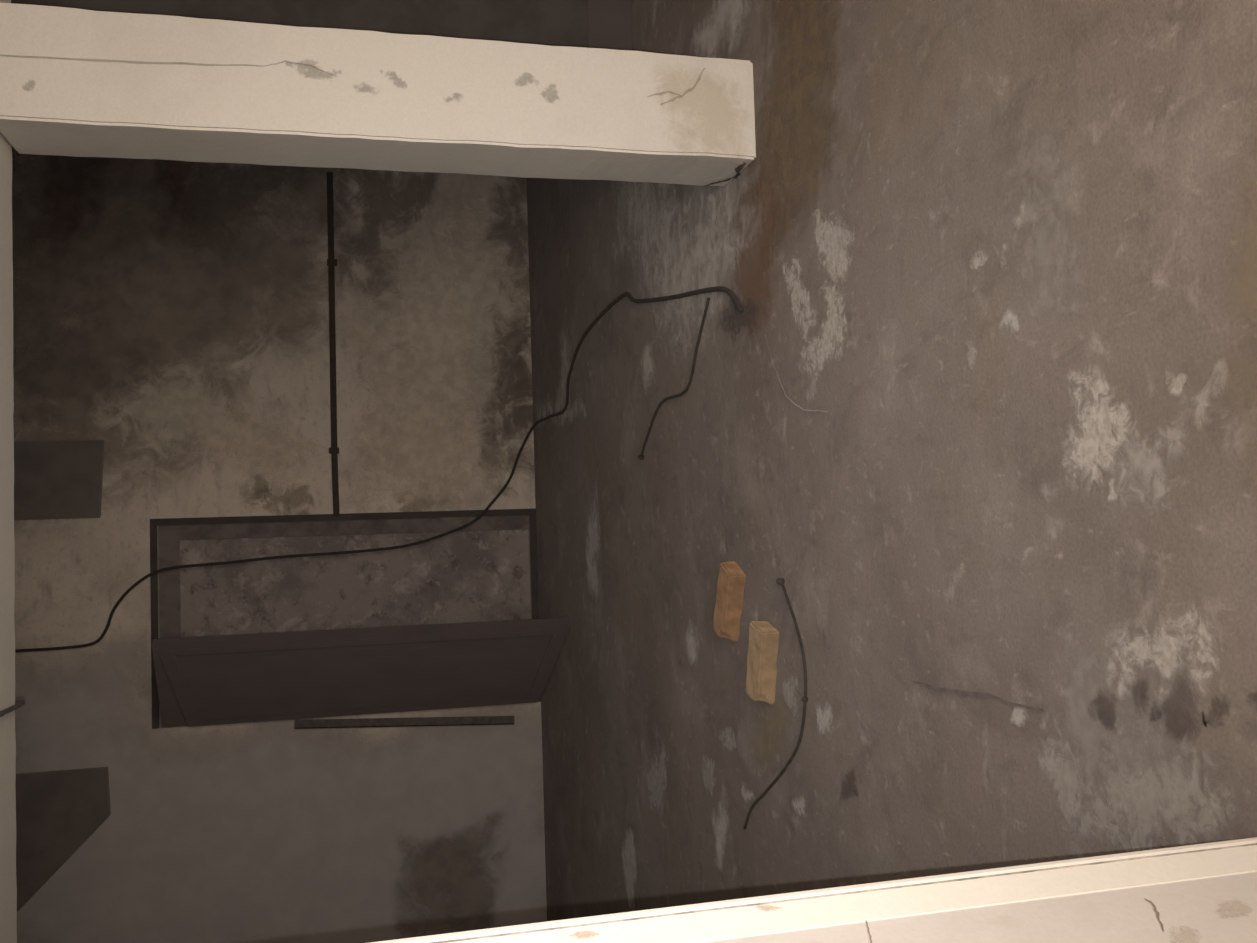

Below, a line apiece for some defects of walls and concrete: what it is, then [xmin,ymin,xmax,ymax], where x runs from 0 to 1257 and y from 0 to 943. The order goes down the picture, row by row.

leakage [12,146,340,482]
leakage [342,169,586,509]